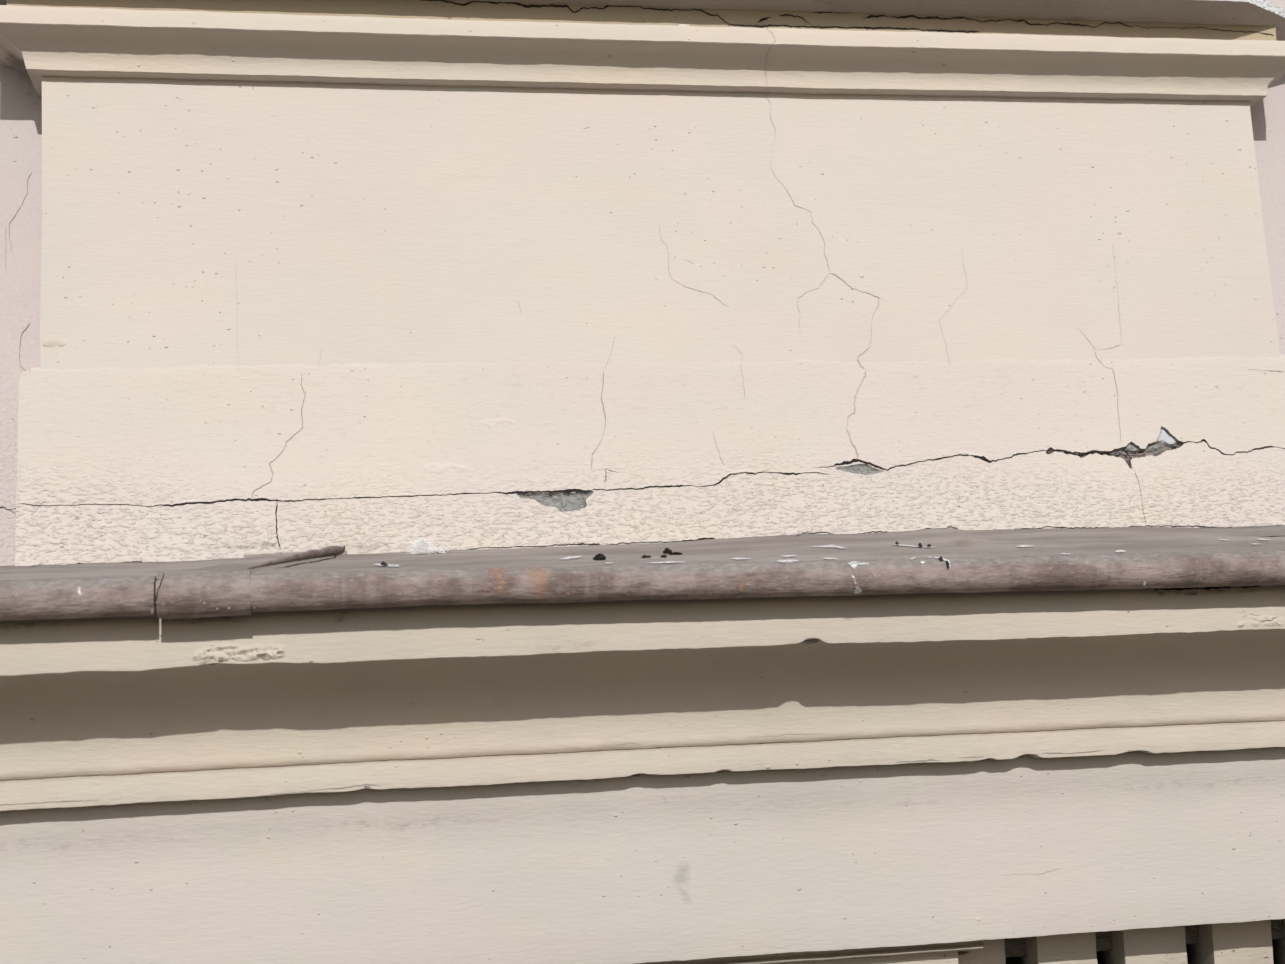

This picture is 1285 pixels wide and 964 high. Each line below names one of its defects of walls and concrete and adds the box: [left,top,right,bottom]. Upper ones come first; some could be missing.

crack [0,0,1285,550]
flaking render [1046,426,1184,468]
flaking render [836,464,883,475]
flaking render [516,491,594,512]